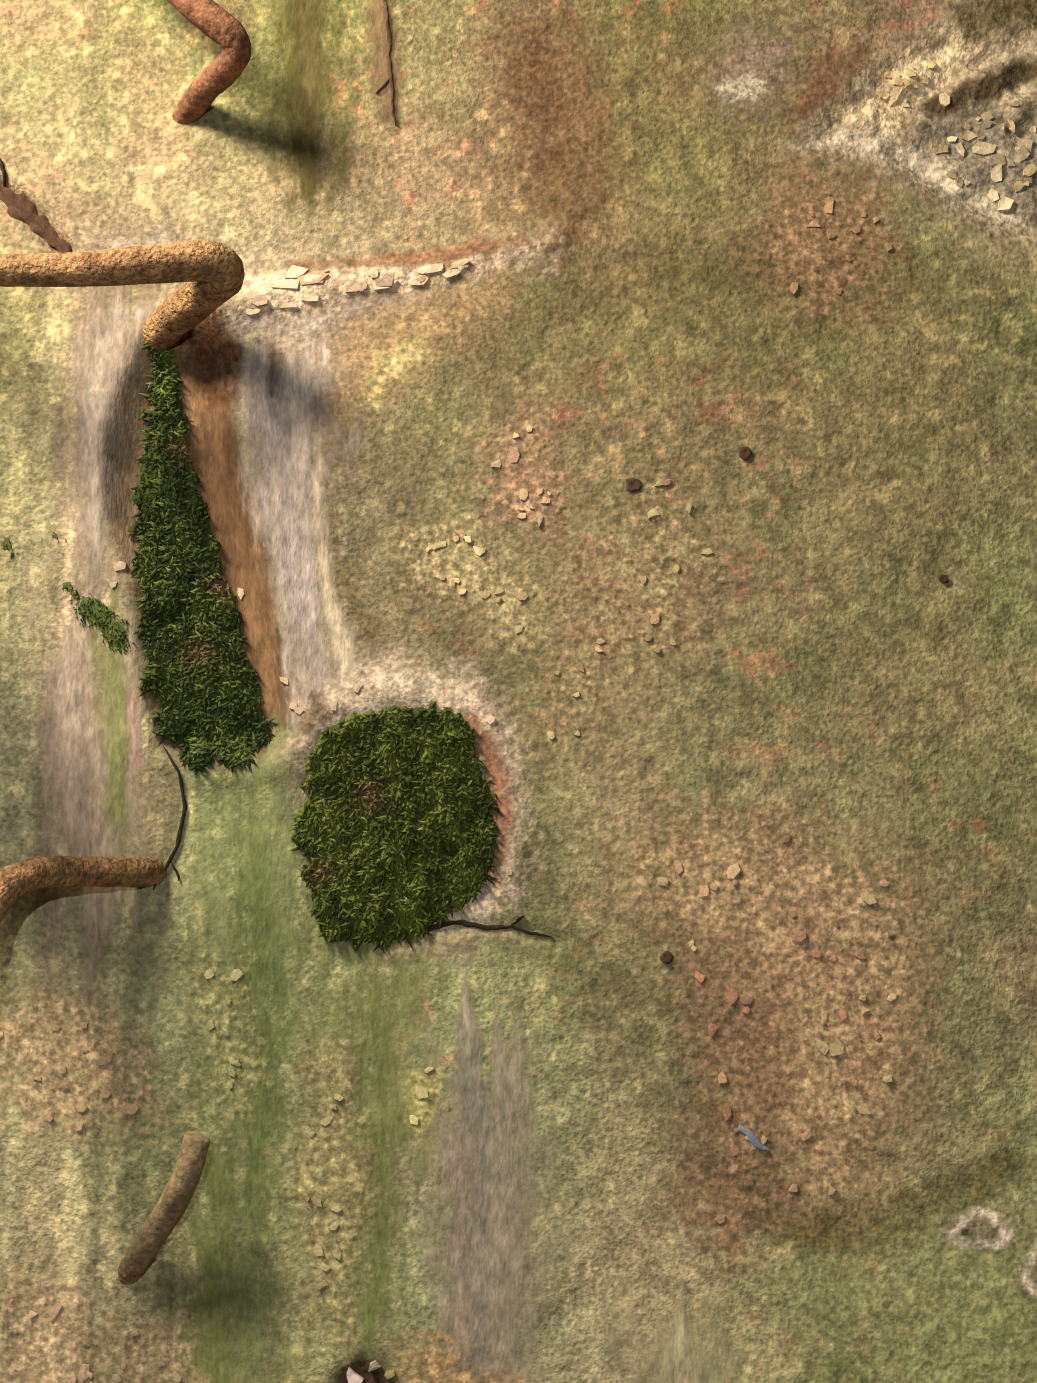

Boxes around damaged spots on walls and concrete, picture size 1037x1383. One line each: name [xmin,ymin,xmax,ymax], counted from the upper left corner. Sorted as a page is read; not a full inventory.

damp [243,272,530,968]